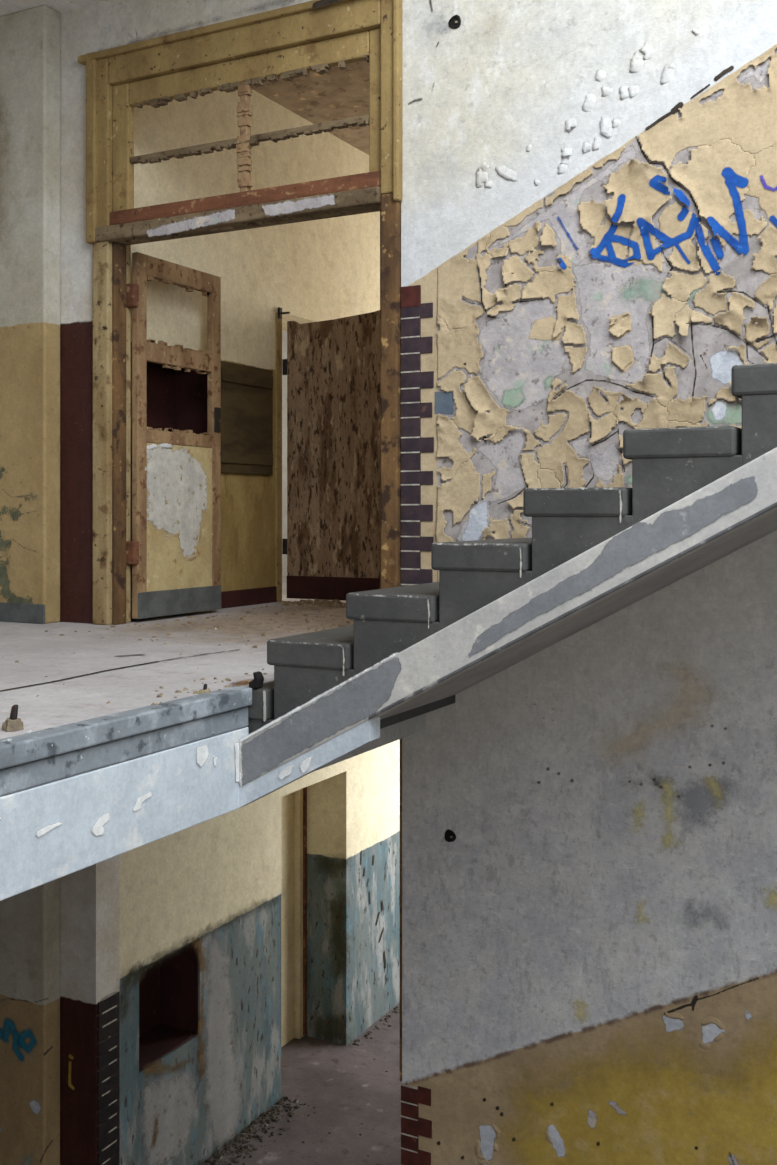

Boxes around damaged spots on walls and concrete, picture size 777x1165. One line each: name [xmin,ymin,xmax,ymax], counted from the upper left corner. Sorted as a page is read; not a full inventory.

peeling [145,443,209,561]
leakage [319,857,346,877]
leakage [330,898,348,975]
spalling [361,850,389,980]
peeling [141,939,242,1165]
leakage [315,1016,347,1043]
peeling [662,1010,685,1032]
peeling [699,1016,725,1050]
peeling [461,1038,777,1165]